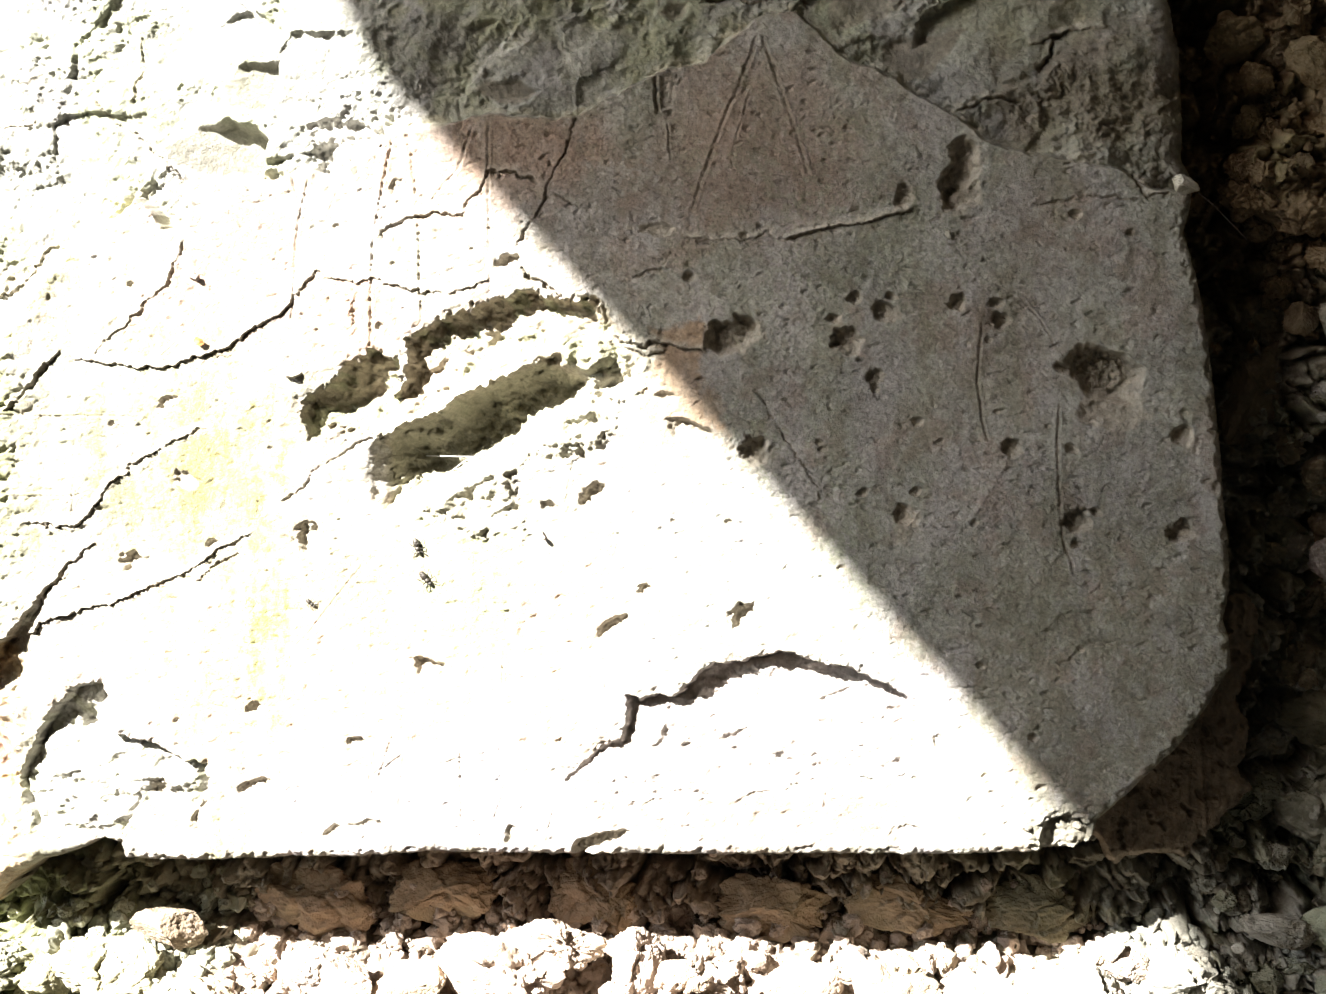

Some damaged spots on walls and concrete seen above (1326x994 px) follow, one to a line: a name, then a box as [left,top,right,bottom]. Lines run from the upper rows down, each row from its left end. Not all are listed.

crack [0,0,1190,414]
spalling [374,320,386,331]
crack [0,416,392,646]
spalling [384,353,587,501]
spalling [535,477,615,516]
spalling [17,678,214,843]
spalling [561,649,919,805]
spalling [929,733,948,752]